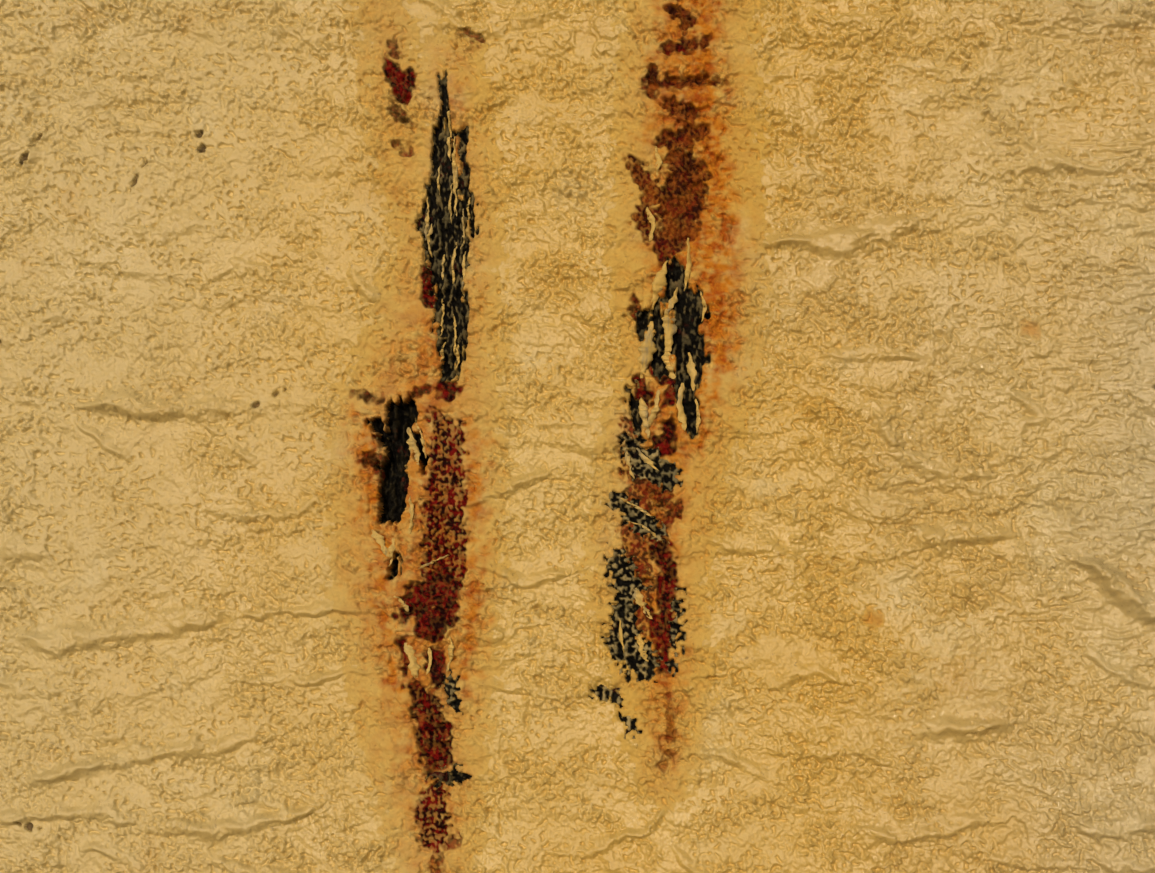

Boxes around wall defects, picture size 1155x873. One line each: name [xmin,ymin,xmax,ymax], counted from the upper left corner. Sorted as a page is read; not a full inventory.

spalling [415,69,479,403]
spalling [366,396,429,580]
rust [314,0,520,873]
spalling [604,491,670,544]
spalling [588,542,688,739]
spalling [618,238,711,494]
rust [575,0,780,812]